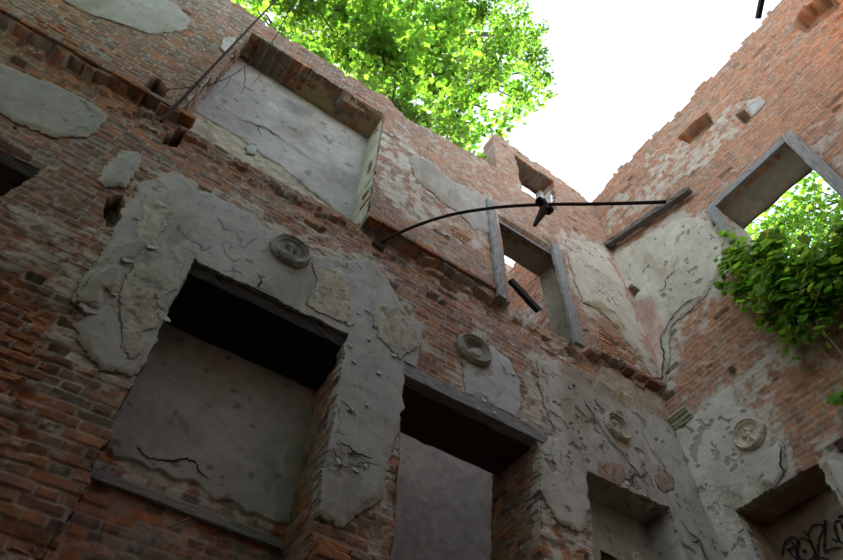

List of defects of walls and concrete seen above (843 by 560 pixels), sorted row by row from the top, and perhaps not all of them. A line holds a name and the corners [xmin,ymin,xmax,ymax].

peeling [306,262,355,326]
crack [660,297,698,396]
crack [137,445,211,480]
crack [333,441,381,468]